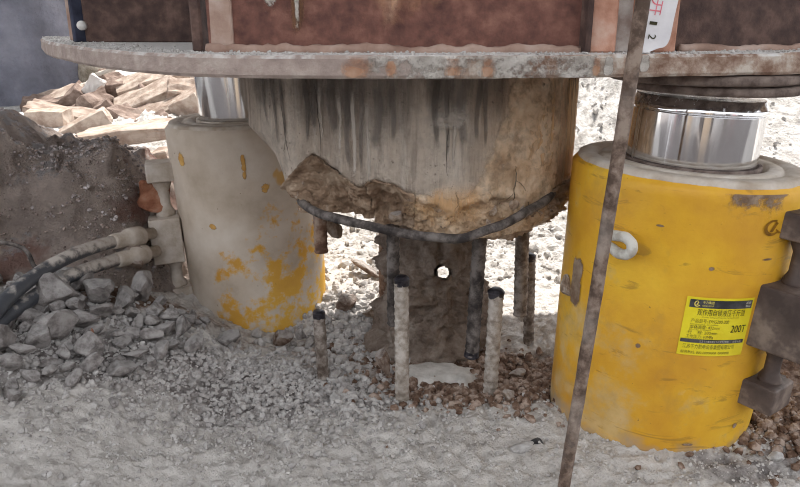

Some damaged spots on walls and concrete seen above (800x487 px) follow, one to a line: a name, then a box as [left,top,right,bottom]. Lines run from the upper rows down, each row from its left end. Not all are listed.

water stain [256,78,286,138]
water stain [299,79,396,172]
rust [344,60,367,78]
water stain [430,78,487,160]
spalling [280,78,570,403]